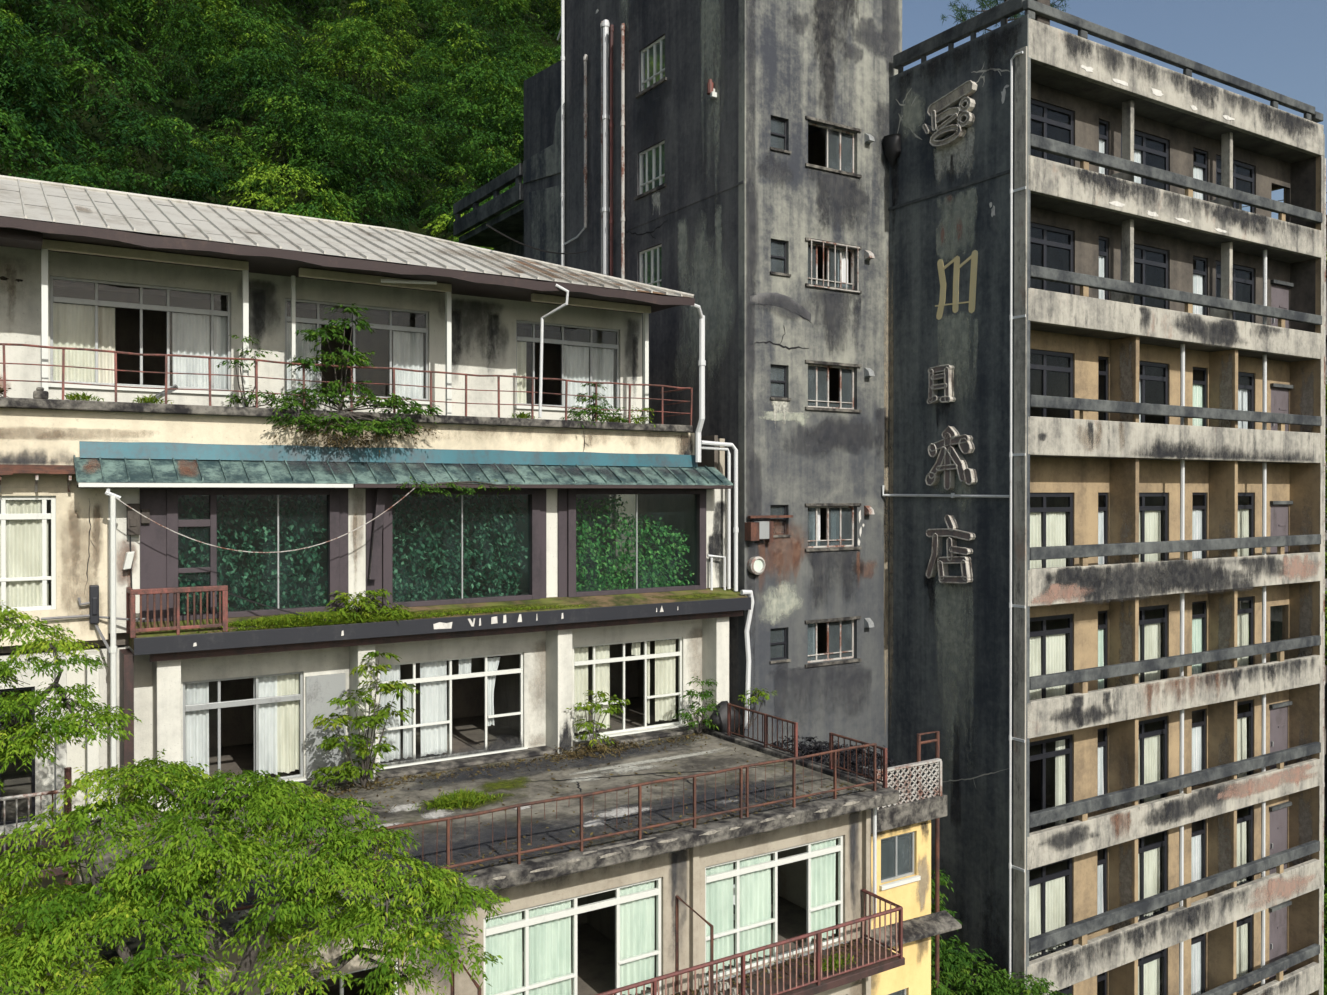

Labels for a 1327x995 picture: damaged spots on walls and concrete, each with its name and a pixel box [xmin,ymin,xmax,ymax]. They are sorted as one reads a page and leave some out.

leakage [813,0,854,127]
leakage [1078,170,1129,198]
leakage [1213,207,1266,233]
leakage [249,281,276,345]
leakage [1140,307,1151,328]
leakage [451,300,505,366]
crack [750,328,809,350]
leakage [1239,556,1284,577]
leakage [1045,567,1111,591]
leakage [1073,696,1083,718]
leakage [1047,826,1098,849]
leakage [1130,928,1143,947]